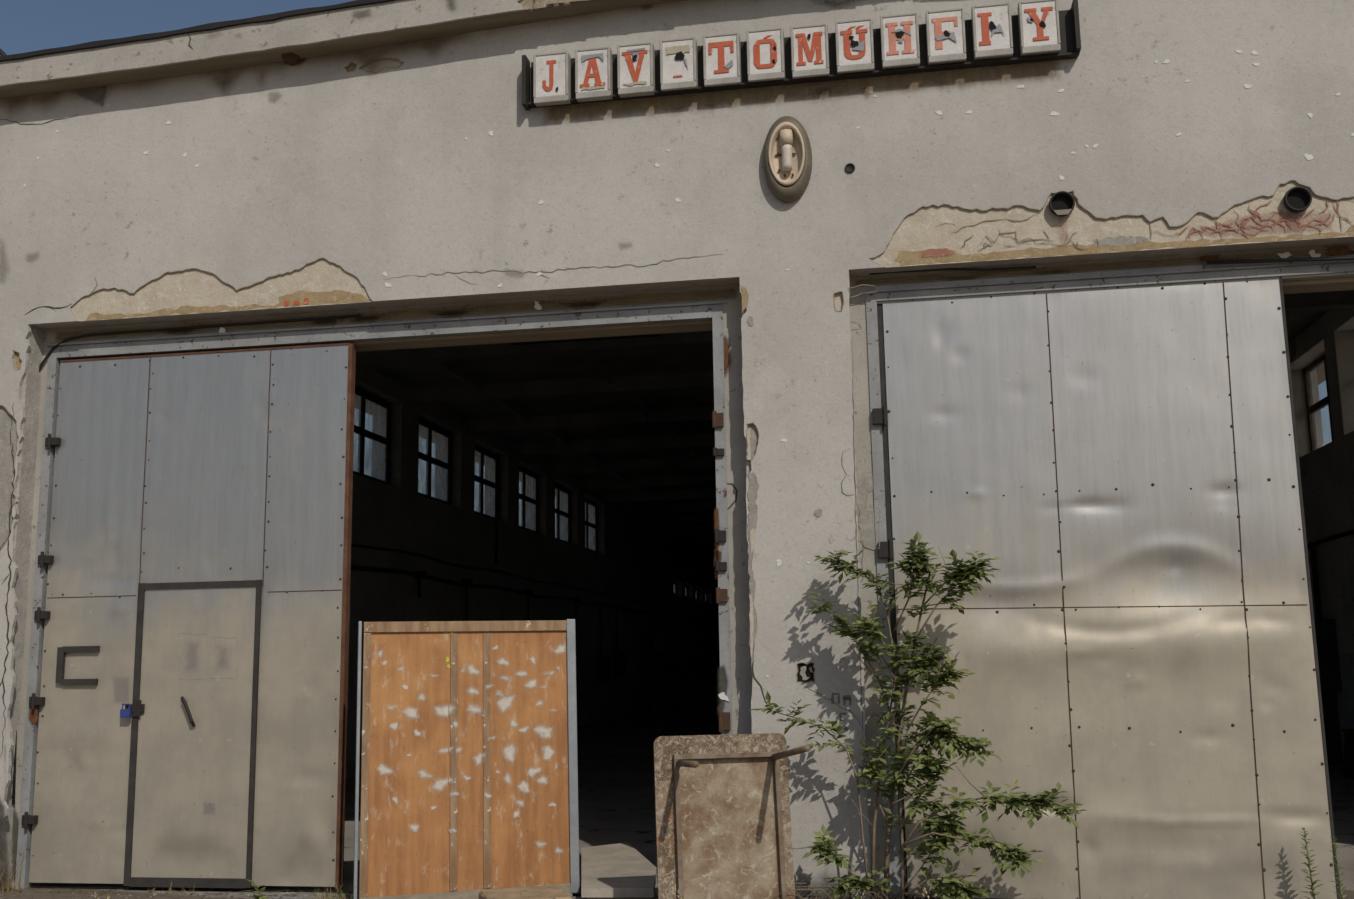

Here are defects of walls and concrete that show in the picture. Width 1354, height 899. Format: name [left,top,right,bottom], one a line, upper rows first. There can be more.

flaking render [871,175,1354,268]
flaking render [71,257,373,333]
crack [389,254,719,284]
crack [0,403,15,758]